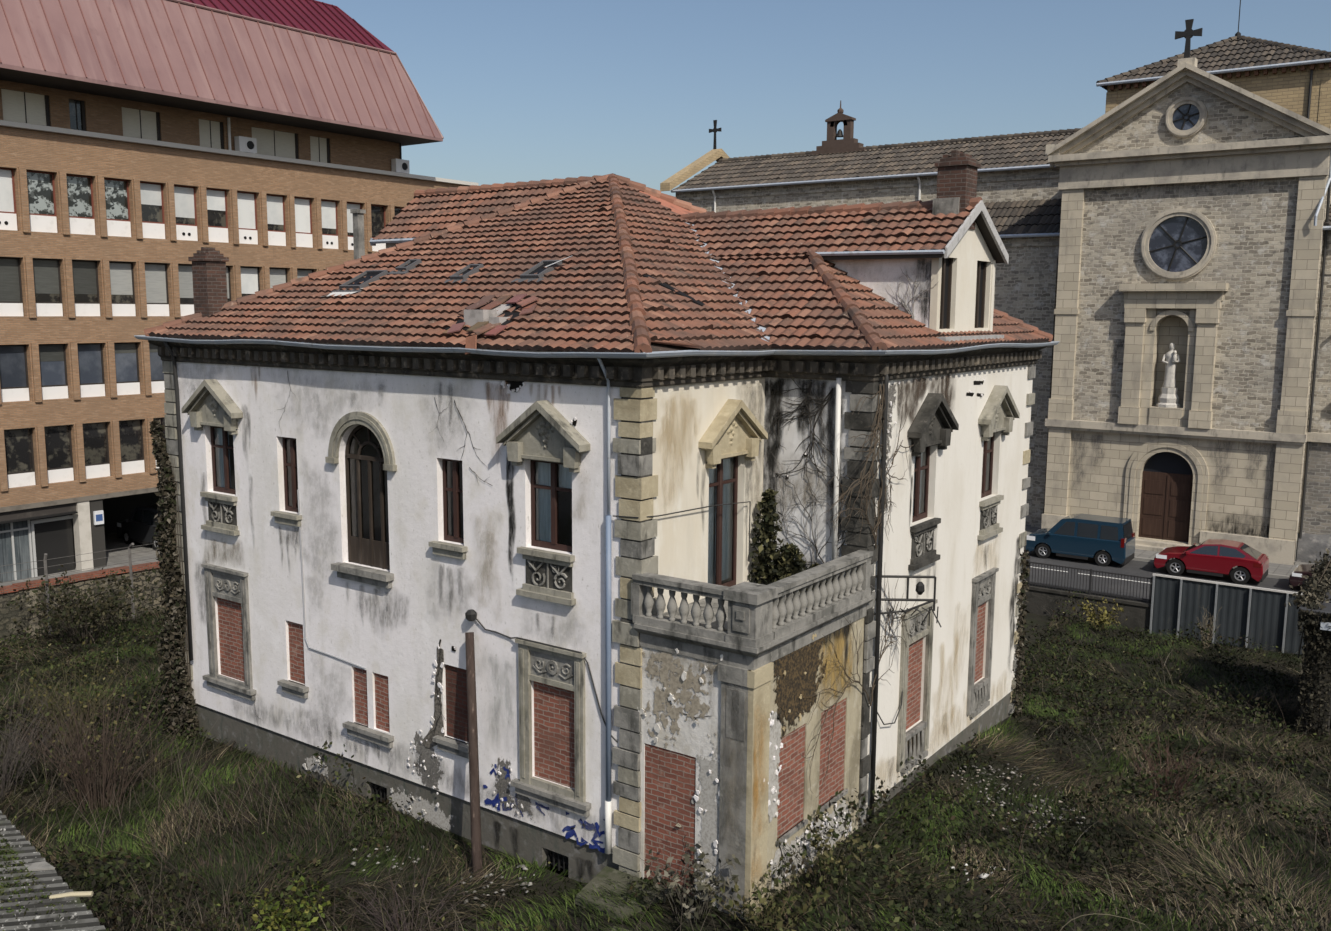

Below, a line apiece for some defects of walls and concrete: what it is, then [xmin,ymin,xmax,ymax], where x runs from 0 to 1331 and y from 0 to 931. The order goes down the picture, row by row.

damp [507,457,515,562]
peeling [389,644,456,832]
peeling [638,648,723,876]
flaking render [763,633,827,822]